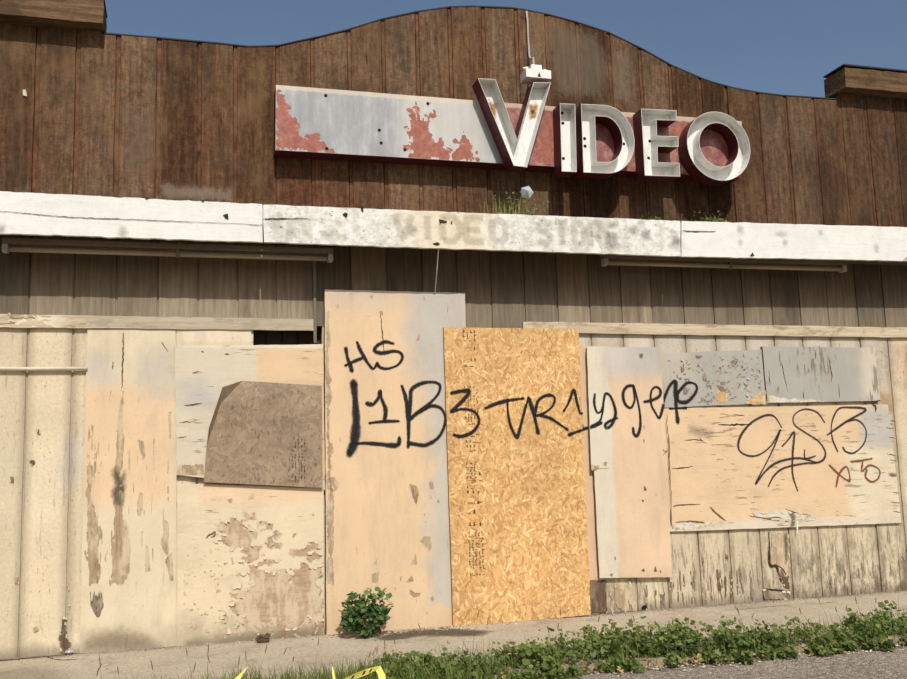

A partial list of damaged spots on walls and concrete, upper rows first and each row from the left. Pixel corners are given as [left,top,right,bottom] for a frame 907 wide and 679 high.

peeling [276,89,335,153]
peeling [403,101,483,162]
peeling [668,351,825,405]
peeling [84,389,154,617]
peeling [141,458,204,583]
peeling [182,305,340,639]
peeling [590,507,816,614]